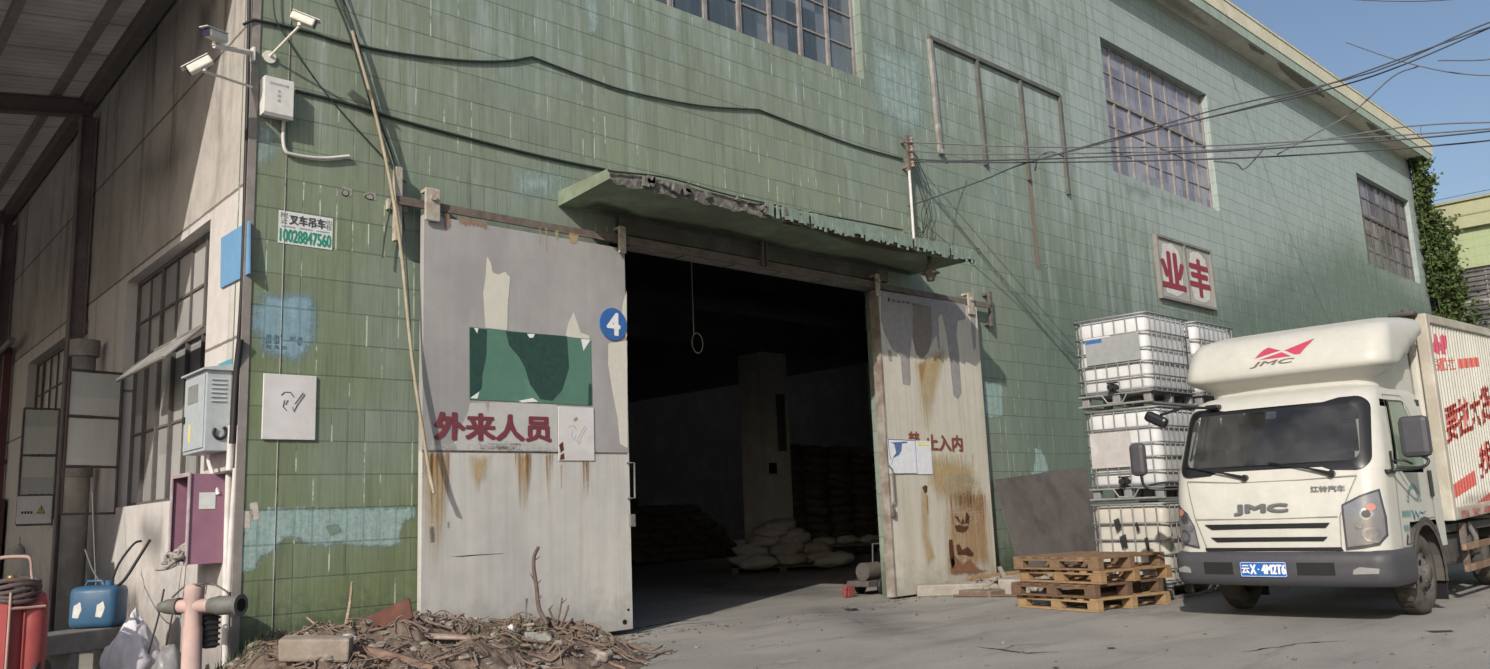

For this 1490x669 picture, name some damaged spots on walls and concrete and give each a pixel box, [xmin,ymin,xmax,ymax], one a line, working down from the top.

peeling [483,257,510,330]
rust [423,453,449,519]
rust [475,447,548,489]
rust [922,460,988,575]